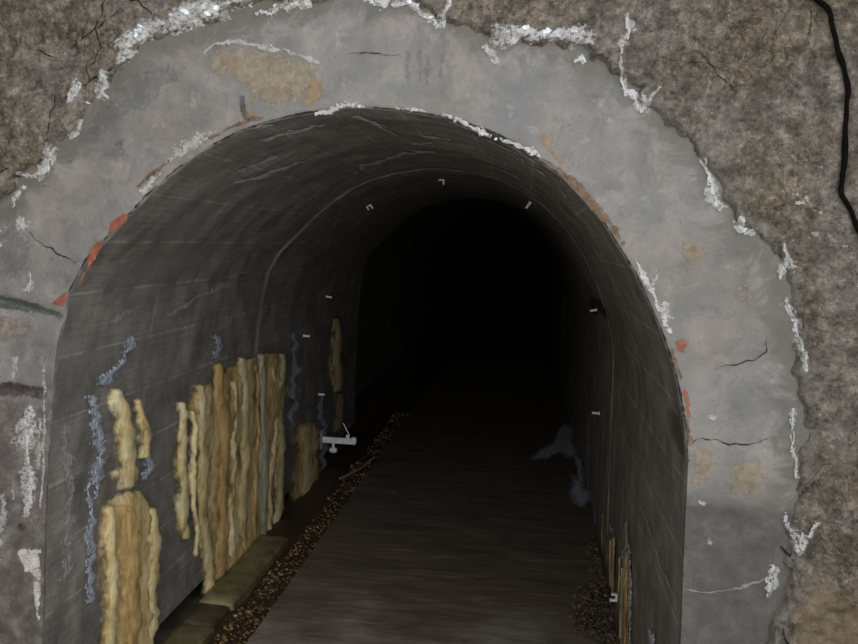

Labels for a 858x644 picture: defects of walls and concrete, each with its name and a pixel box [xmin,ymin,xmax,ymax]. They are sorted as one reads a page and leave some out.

crack [47,0,154,133]
corrosion [208,110,264,139]
crack [374,107,557,173]
corrosion [541,134,625,245]
water stain [0,272,62,318]
crack [28,232,110,293]
corrosion [53,214,127,306]
corrosion [670,339,693,445]
crack [604,222,769,462]
water stain [0,356,47,547]
water stain [58,336,162,644]
water stain [176,318,345,594]